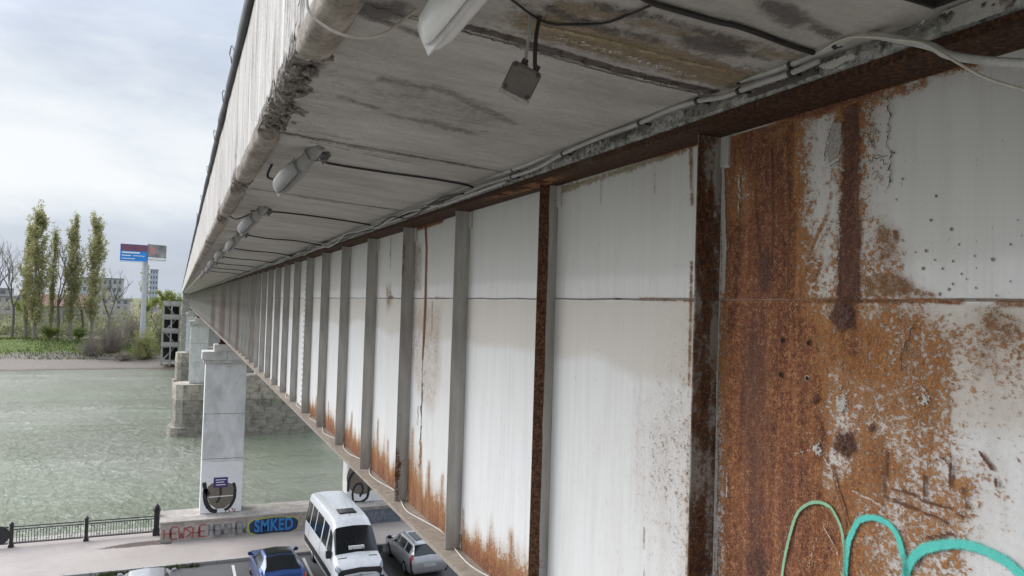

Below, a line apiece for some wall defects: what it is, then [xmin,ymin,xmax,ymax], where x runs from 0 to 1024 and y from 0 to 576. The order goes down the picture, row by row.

spalling [258,25,335,132]
water stain [508,1,891,98]
crack [824,93,895,189]
corrosion [713,64,1024,576]
corrosion [309,402,446,535]
corrosion [461,513,528,576]